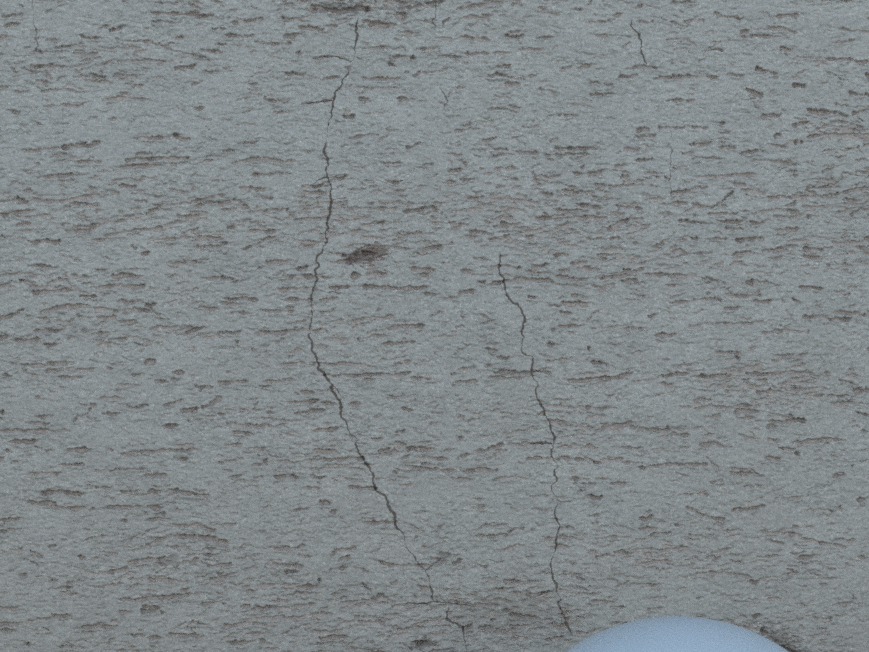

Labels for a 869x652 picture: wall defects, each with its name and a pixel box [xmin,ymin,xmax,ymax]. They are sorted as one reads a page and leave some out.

crack [306,17,473,652]
crack [498,252,572,634]